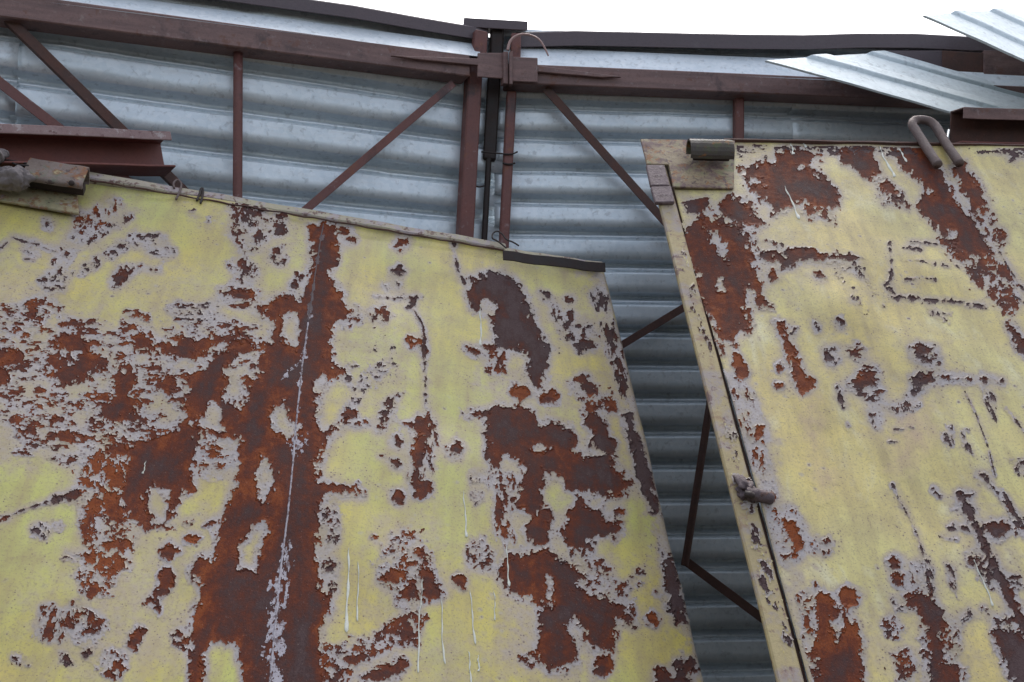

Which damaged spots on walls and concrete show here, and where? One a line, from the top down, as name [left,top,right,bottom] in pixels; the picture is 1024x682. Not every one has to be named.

peeling [0,195,263,682]
peeling [221,202,307,290]
rust [119,220,430,682]
peeling [337,234,422,448]
peeling [368,468,519,611]
rust [457,269,665,679]
peeling [723,369,794,652]
rust [795,580,867,682]
peeling [789,312,889,430]
rust [681,144,1024,397]
peeling [877,555,919,682]
peeling [936,235,1021,325]